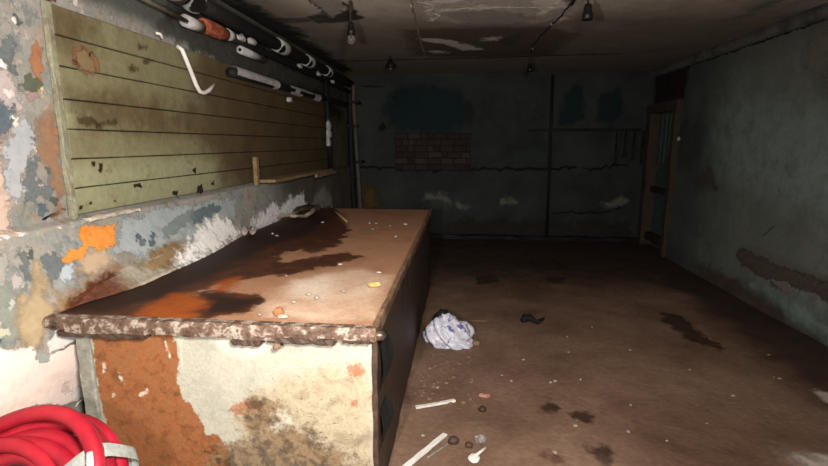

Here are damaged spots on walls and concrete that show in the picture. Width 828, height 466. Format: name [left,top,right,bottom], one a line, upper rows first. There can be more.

crack [460,163,631,172]
peeling [0,13,86,417]
peeling [278,208,320,218]
peeling [67,196,237,306]
spalling [736,248,828,302]